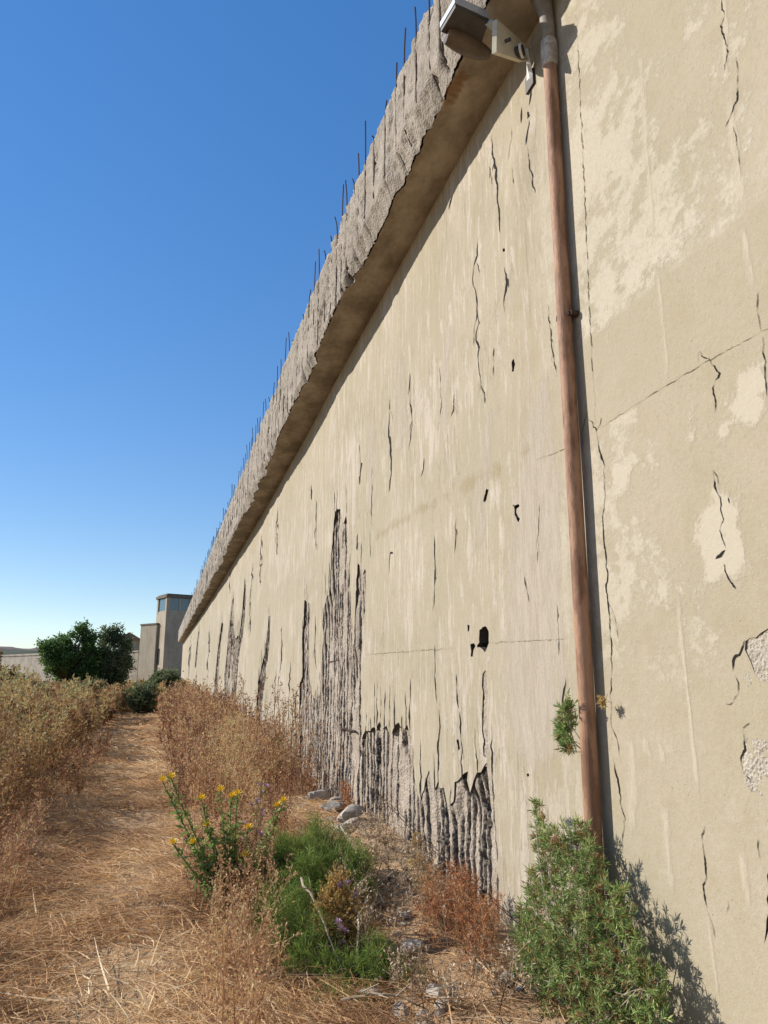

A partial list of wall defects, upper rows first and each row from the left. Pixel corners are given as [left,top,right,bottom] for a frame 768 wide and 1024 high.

crack [720,0,741,177]
crack [472,90,535,402]
crack [575,27,767,837]
spalling [300,493,499,914]
spalling [742,629,768,688]
spalling [742,738,768,796]
crack [701,827,729,938]